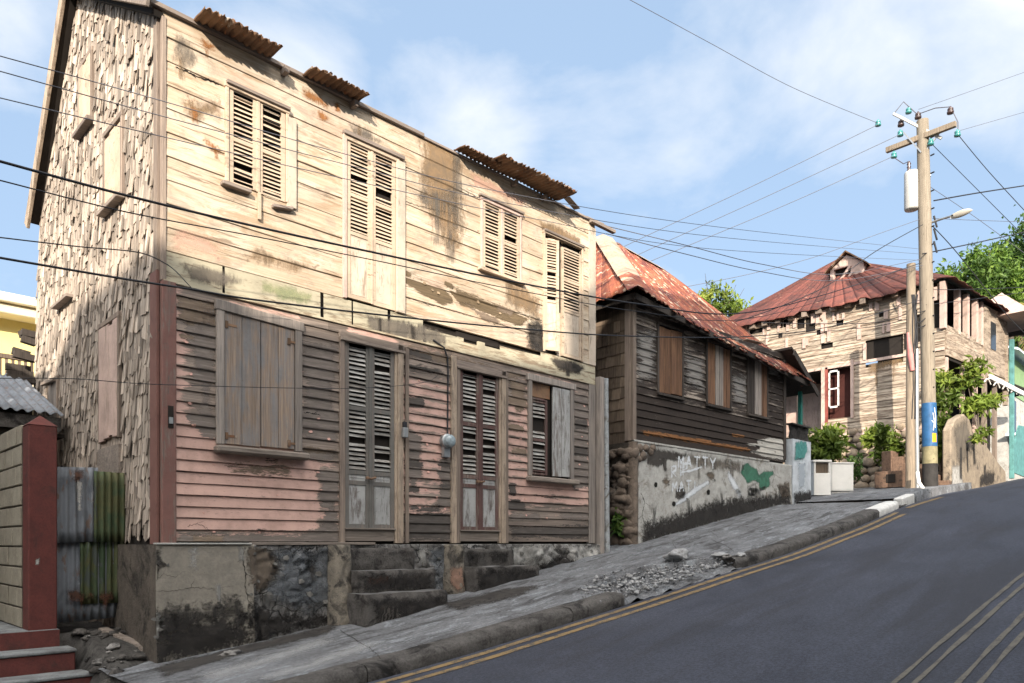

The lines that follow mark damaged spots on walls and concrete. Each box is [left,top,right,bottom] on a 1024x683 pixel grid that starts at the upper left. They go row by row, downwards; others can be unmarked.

leakage [419,141,463,262]
peeling [404,395,425,408]
peeling [404,345,494,386]
leakage [444,281,583,377]
peeling [178,340,339,617]
peeling [404,432,464,590]
leakage [641,487,811,542]
leakage [154,585,376,679]